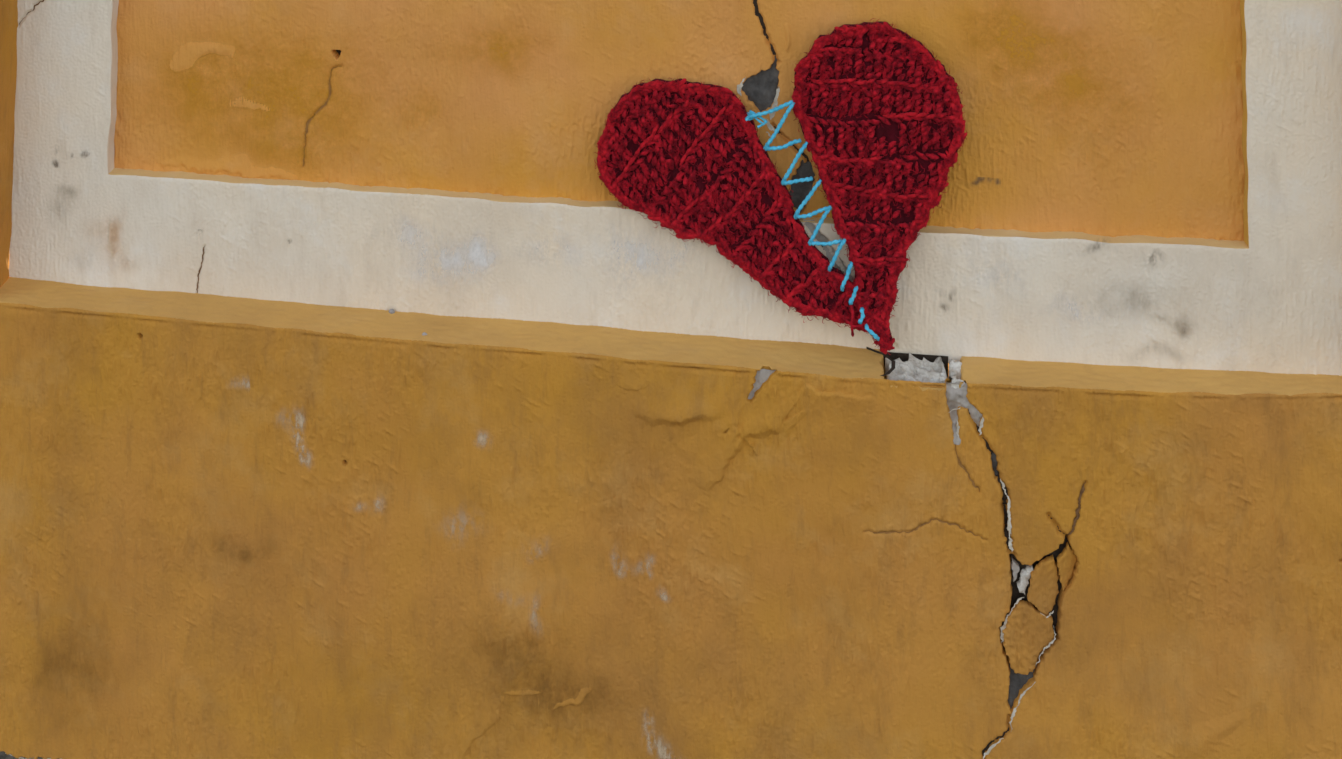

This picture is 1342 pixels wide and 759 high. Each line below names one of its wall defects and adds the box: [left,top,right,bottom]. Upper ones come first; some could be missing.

crack [303,66,342,166]
crack [737,0,854,283]
peeling [883,352,948,377]
crack [865,376,1086,759]